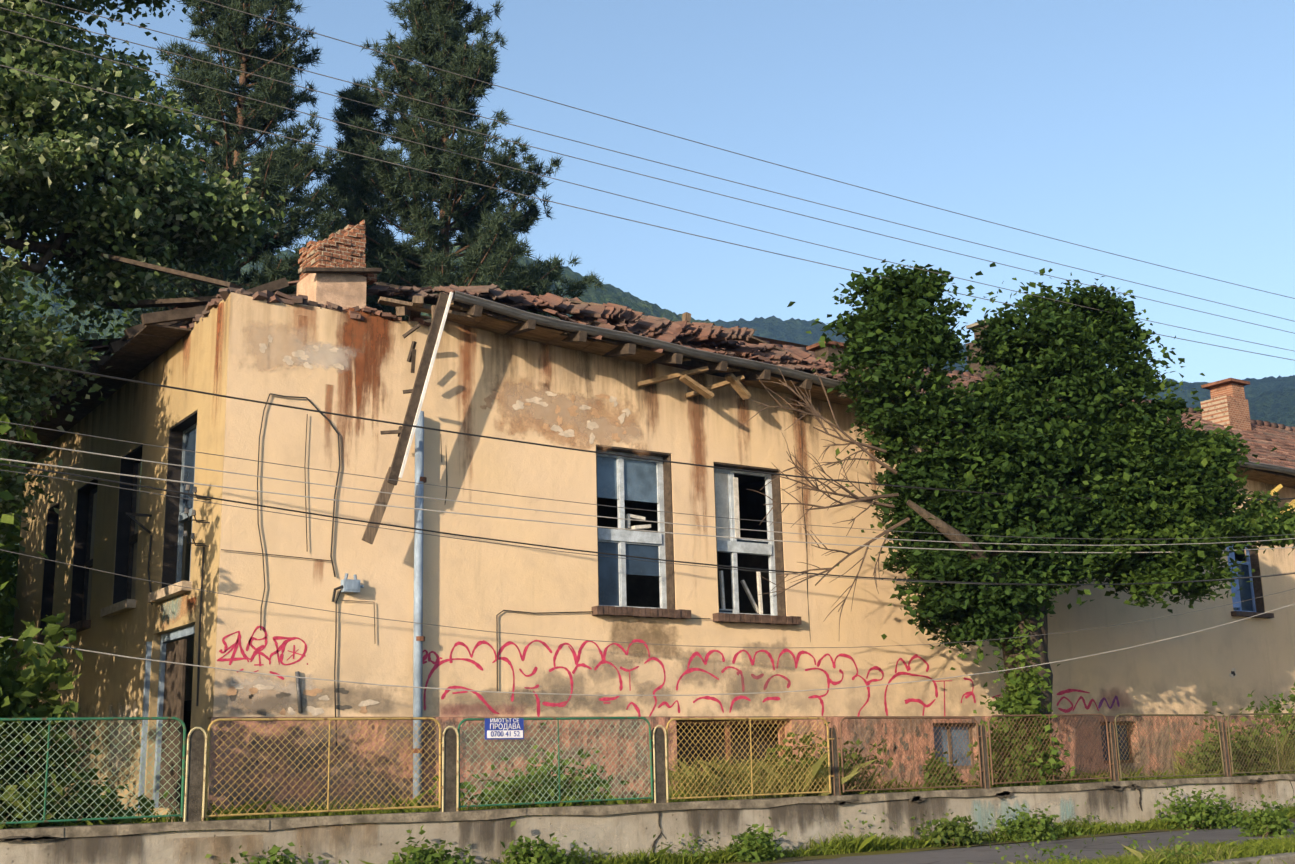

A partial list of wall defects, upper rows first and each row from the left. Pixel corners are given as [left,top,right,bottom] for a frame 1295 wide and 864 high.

peeling [250,328,346,370]
rust [325,307,390,445]
peeling [480,386,638,446]